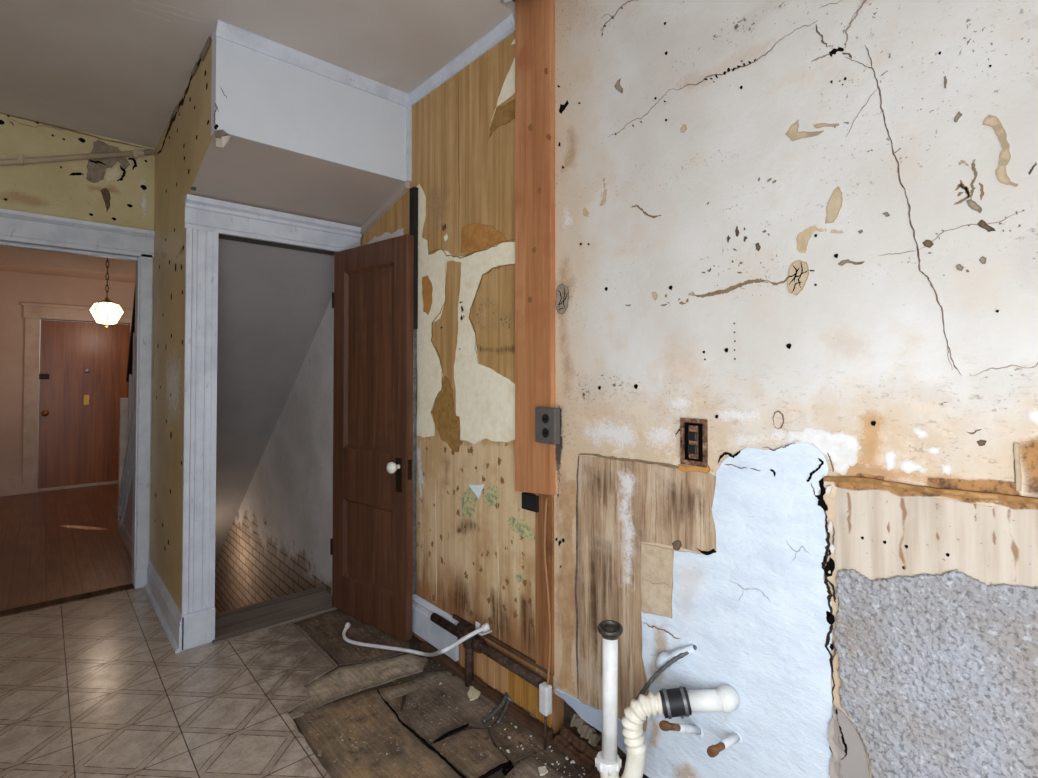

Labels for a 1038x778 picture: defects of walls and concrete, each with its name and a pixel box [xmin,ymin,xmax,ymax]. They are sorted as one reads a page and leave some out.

crack [0,36,212,155]
crack [608,20,818,137]
peeling [982,115,1018,187]
peeling [652,186,843,306]
crack [846,46,1038,376]
leakage [719,410,759,423]
leakage [416,448,424,498]
leakage [597,472,635,583]
leakage [522,602,534,647]
leakage [591,562,606,643]
peeling [554,442,1038,778]